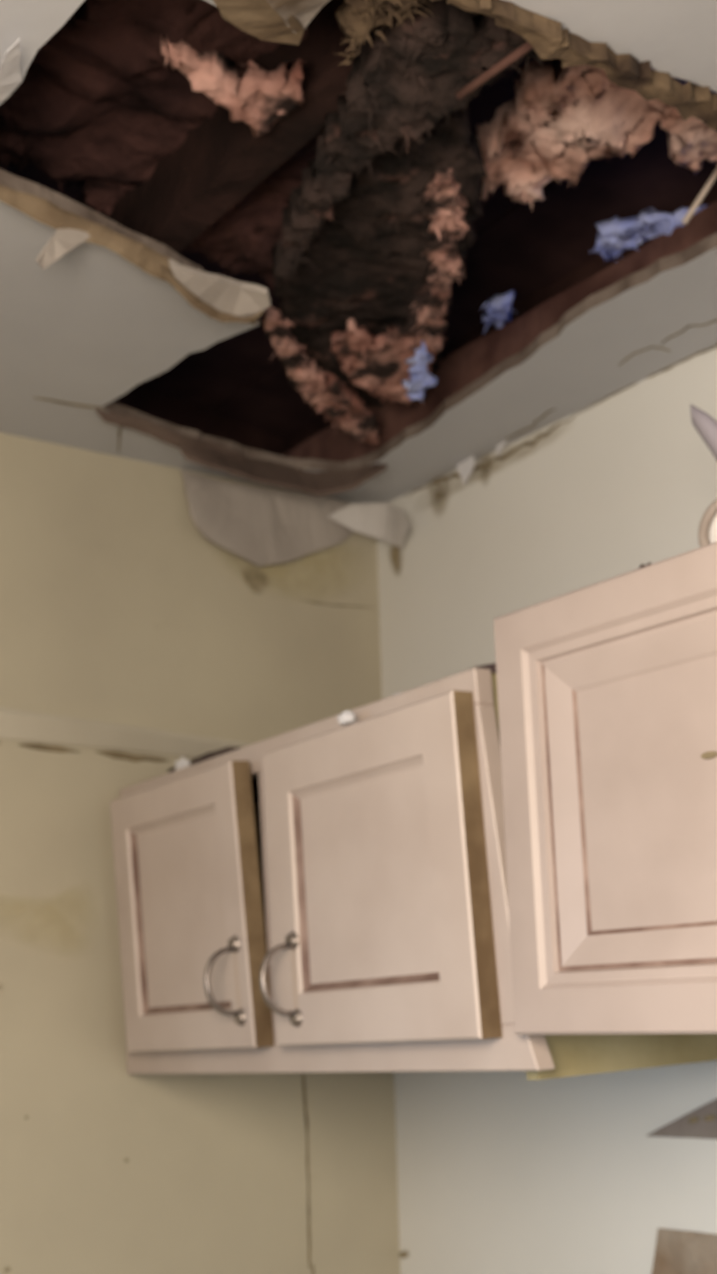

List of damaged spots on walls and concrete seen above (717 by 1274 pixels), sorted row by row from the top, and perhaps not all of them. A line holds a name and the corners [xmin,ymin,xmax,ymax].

peeling [456,456,475,485]
leakage [391,546,400,572]
crack [302,1074,314,1274]